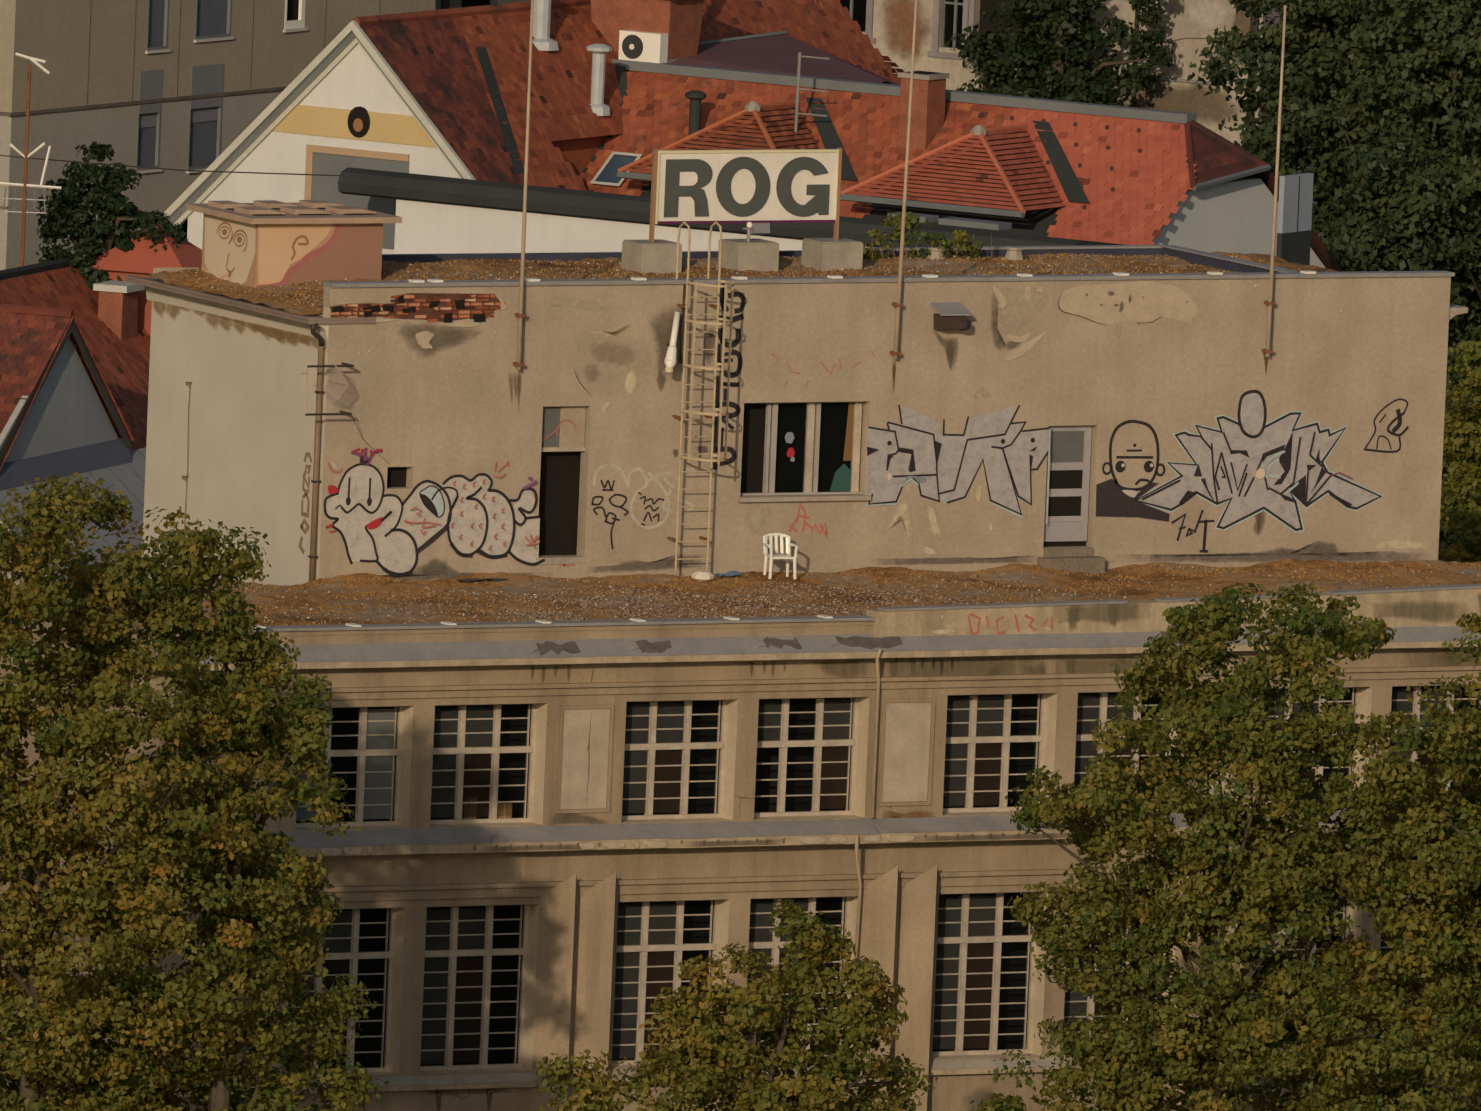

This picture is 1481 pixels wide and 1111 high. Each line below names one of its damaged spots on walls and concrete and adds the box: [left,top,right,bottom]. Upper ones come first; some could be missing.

spalling [323,293,507,327]